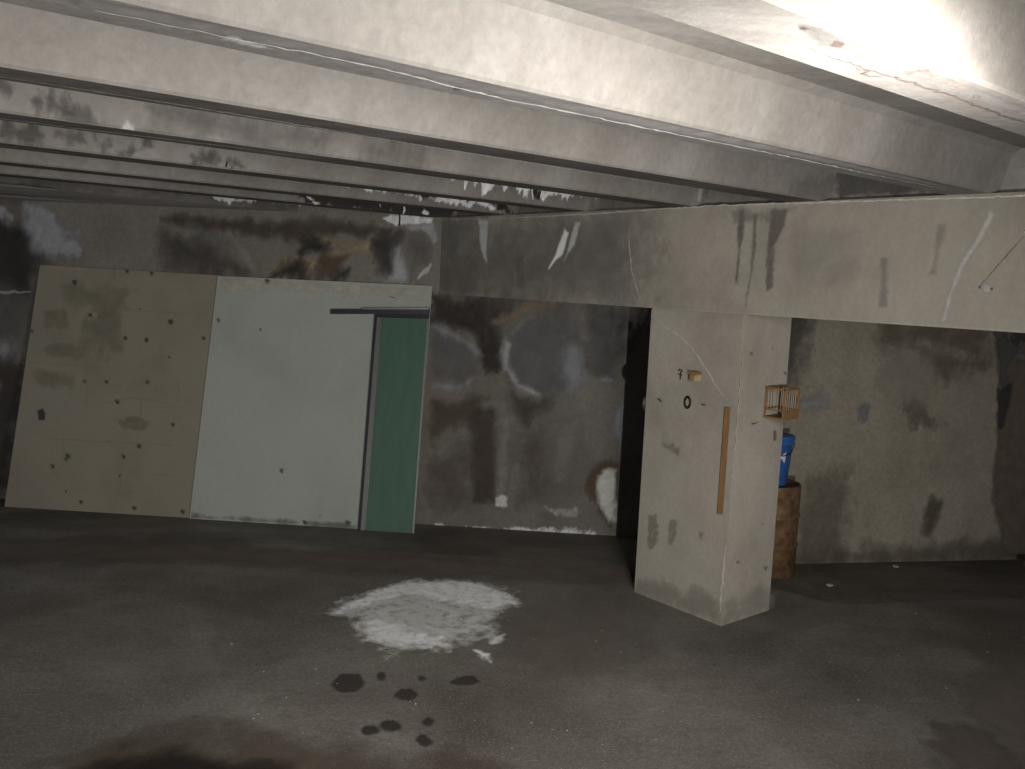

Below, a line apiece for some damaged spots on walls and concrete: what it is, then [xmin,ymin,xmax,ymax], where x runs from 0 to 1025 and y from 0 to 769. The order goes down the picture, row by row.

water stain [0,100,251,167]
water stain [38,10,1025,288]
water stain [0,184,127,260]
crack [979,238,1022,287]
water stain [1011,332,1025,345]
water stain [430,296,628,507]
water stain [997,384,1011,428]
water stain [504,506,596,535]